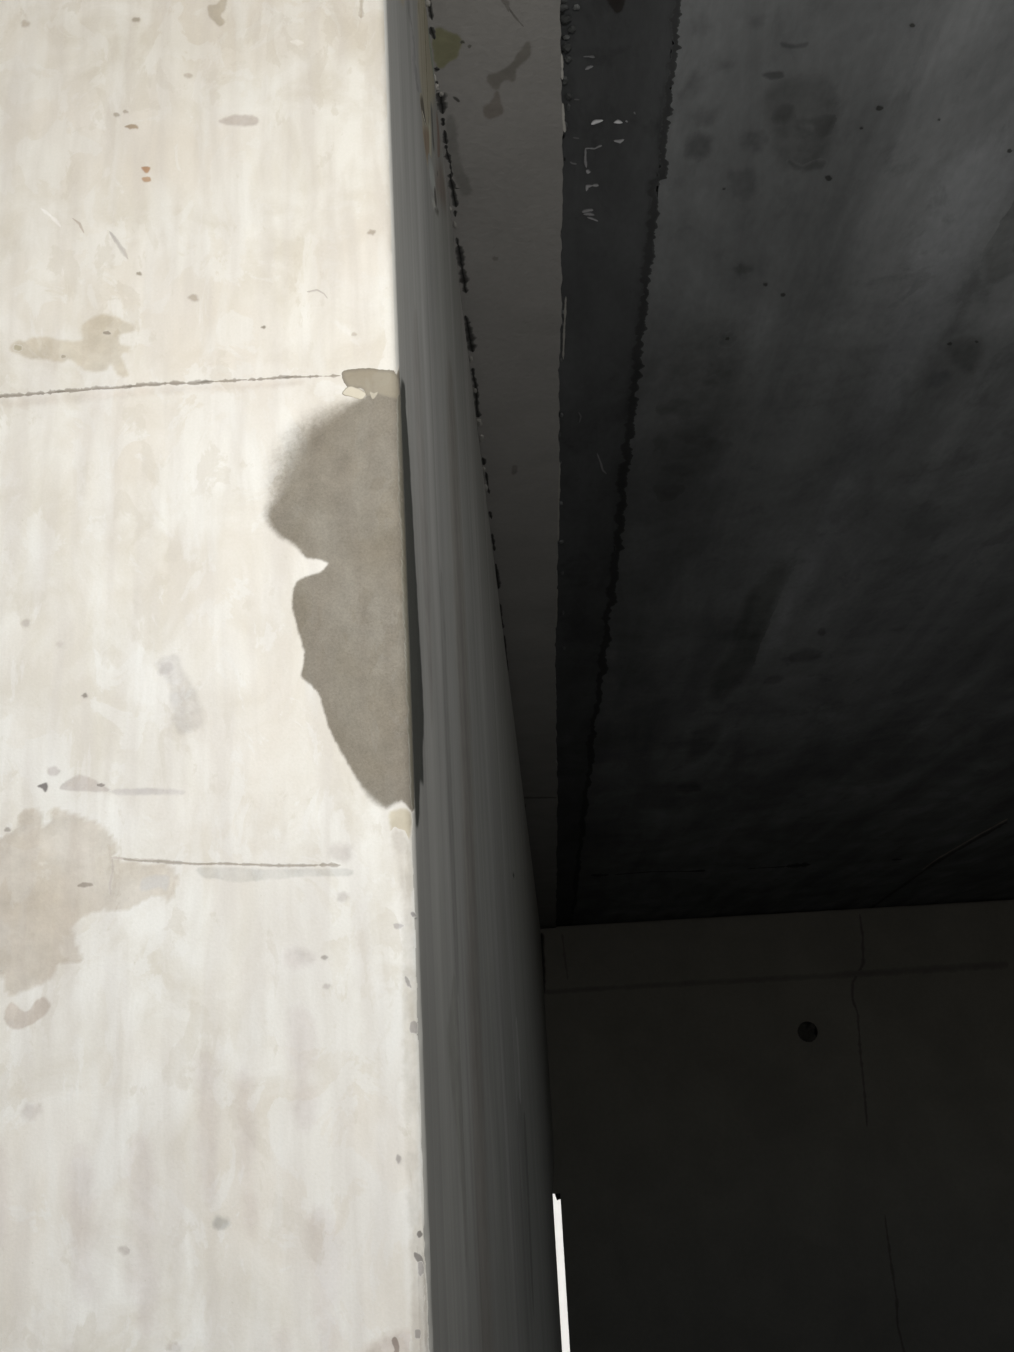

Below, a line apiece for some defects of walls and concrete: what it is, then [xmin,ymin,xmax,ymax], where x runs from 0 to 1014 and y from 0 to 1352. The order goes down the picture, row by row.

crack [0,374,341,412]
crack [110,856,355,884]